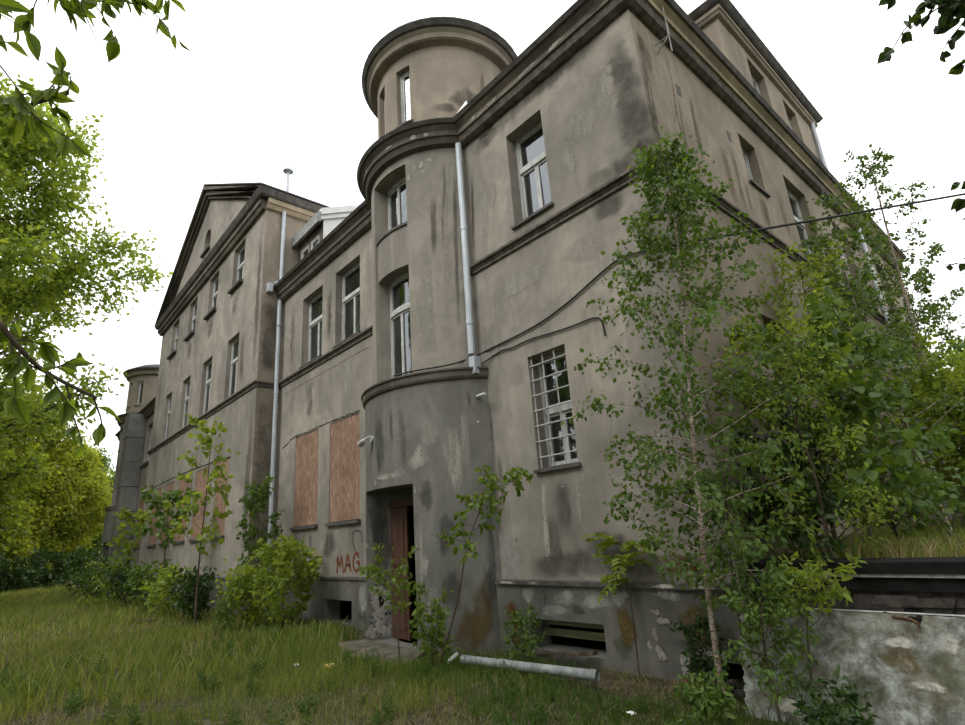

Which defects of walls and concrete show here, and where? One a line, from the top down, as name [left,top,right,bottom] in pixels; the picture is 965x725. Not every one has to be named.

water stain [541,483,551,554]
flaking render [363,577,393,640]
peeling [562,589,628,613]
peeling [657,584,675,599]